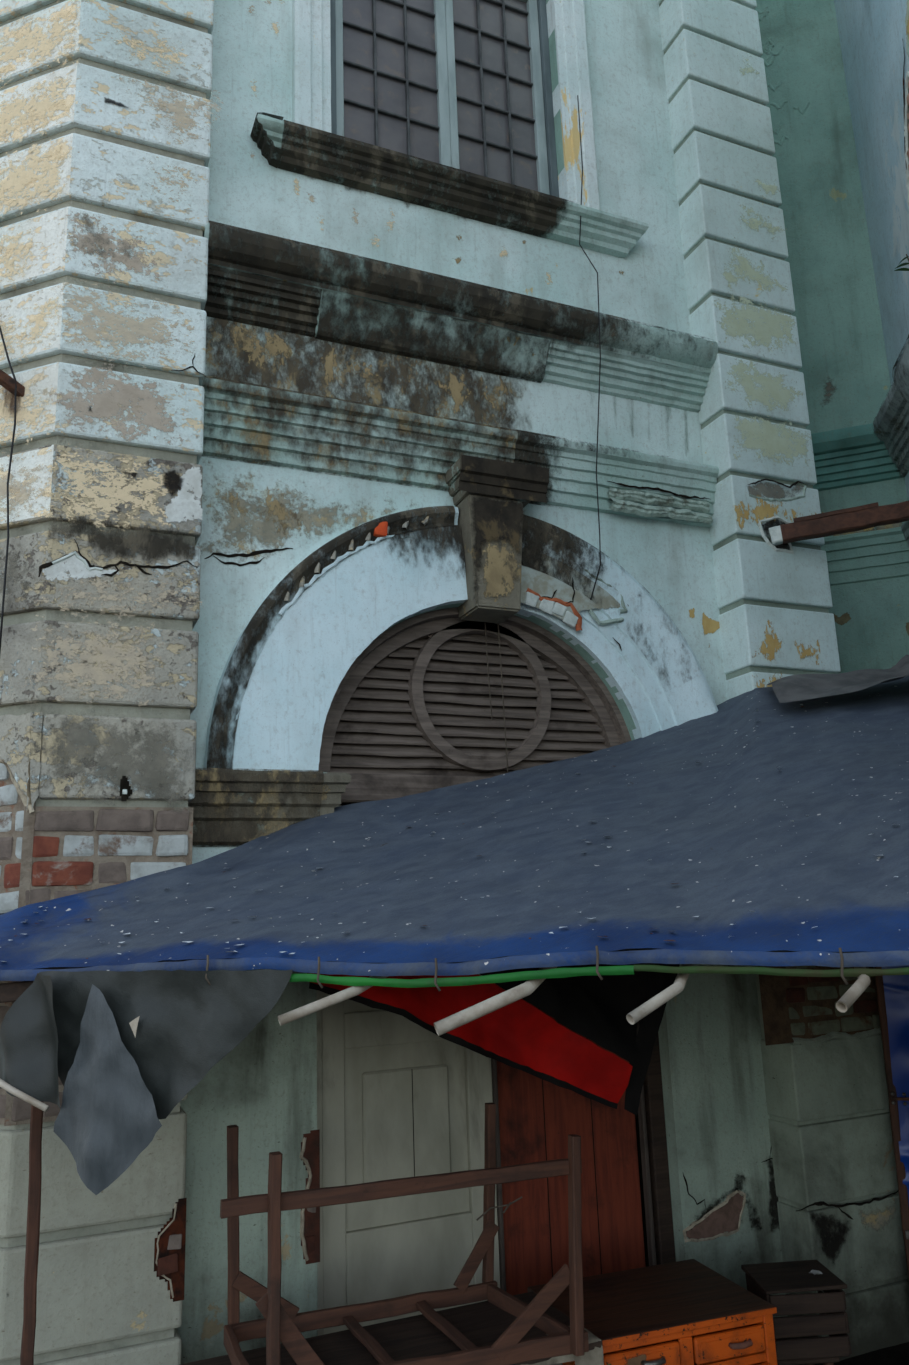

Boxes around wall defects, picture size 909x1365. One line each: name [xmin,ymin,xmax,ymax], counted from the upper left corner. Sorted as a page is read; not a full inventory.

peeling [0,0,203,533]
peeling [714,246,823,554]
spalling [607,481,709,499]
crack [38,539,293,577]
water stain [190,220,703,847]
peeling [0,551,202,706]
peeling [689,608,720,648]
peeling [752,620,820,688]
flaking render [0,718,193,915]
flaking render [0,1076,64,1126]
crack [683,1174,706,1207]
crack [796,1191,898,1219]